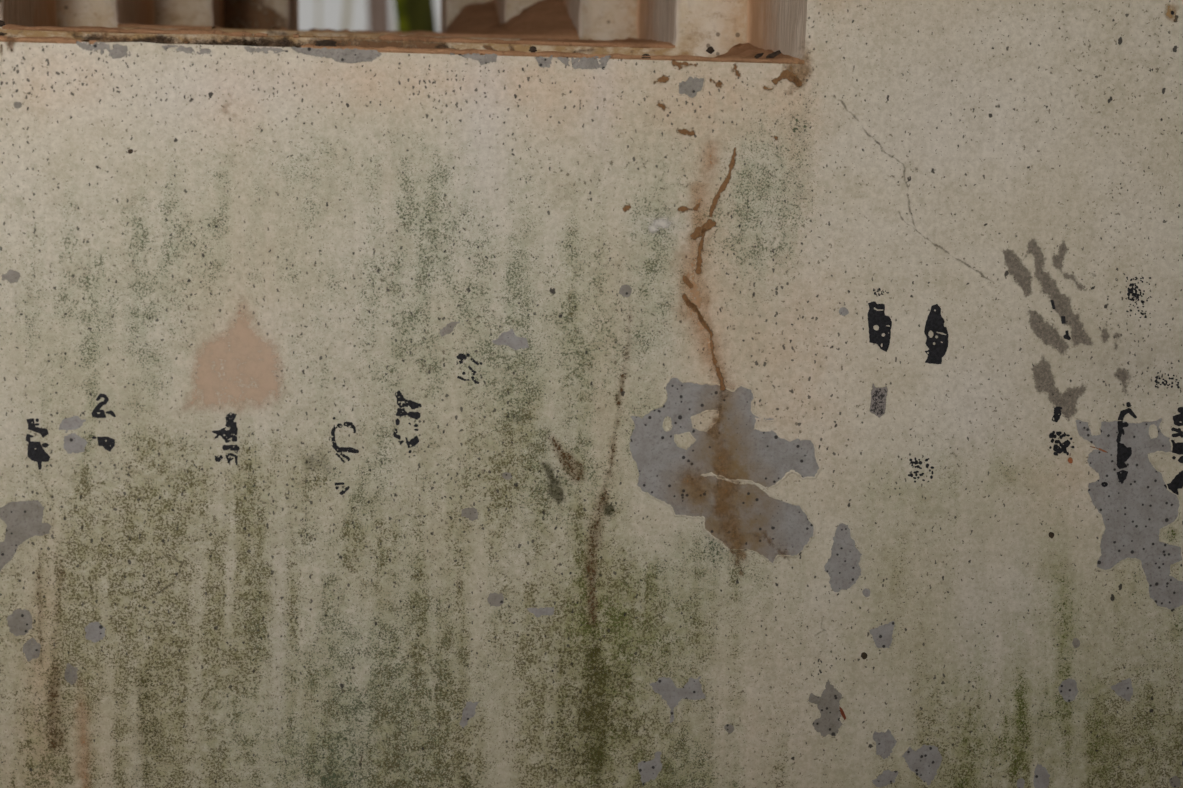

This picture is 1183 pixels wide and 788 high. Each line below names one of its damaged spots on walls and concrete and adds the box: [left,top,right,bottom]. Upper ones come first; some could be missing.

rust [653,59,698,84]
rust [763,57,809,91]
rust [677,147,736,391]
peeling [0,497,54,574]
water stain [548,437,587,481]
water stain [584,345,630,627]
peeling [627,375,823,566]
peeling [822,521,870,597]
peeling [1073,415,1183,613]
peeling [4,605,35,638]
water stain [36,554,65,751]
peeling [804,677,846,738]